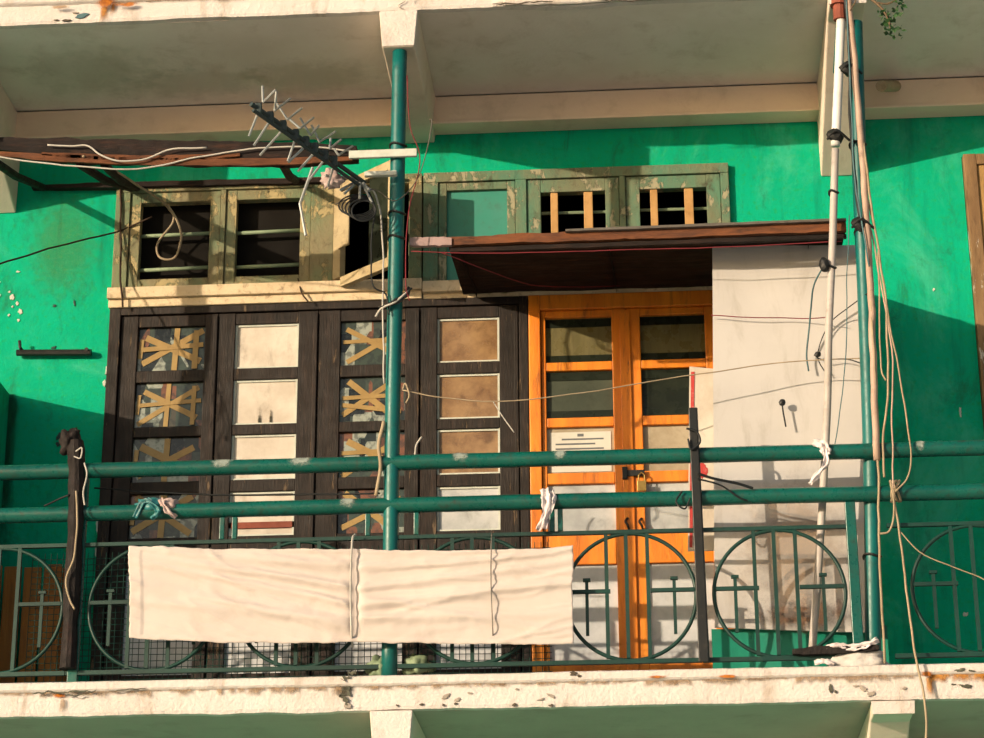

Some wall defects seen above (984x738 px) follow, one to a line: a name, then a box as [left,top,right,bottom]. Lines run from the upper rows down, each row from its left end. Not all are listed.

rust [98,0,135,17]
rust [922,671,933,692]